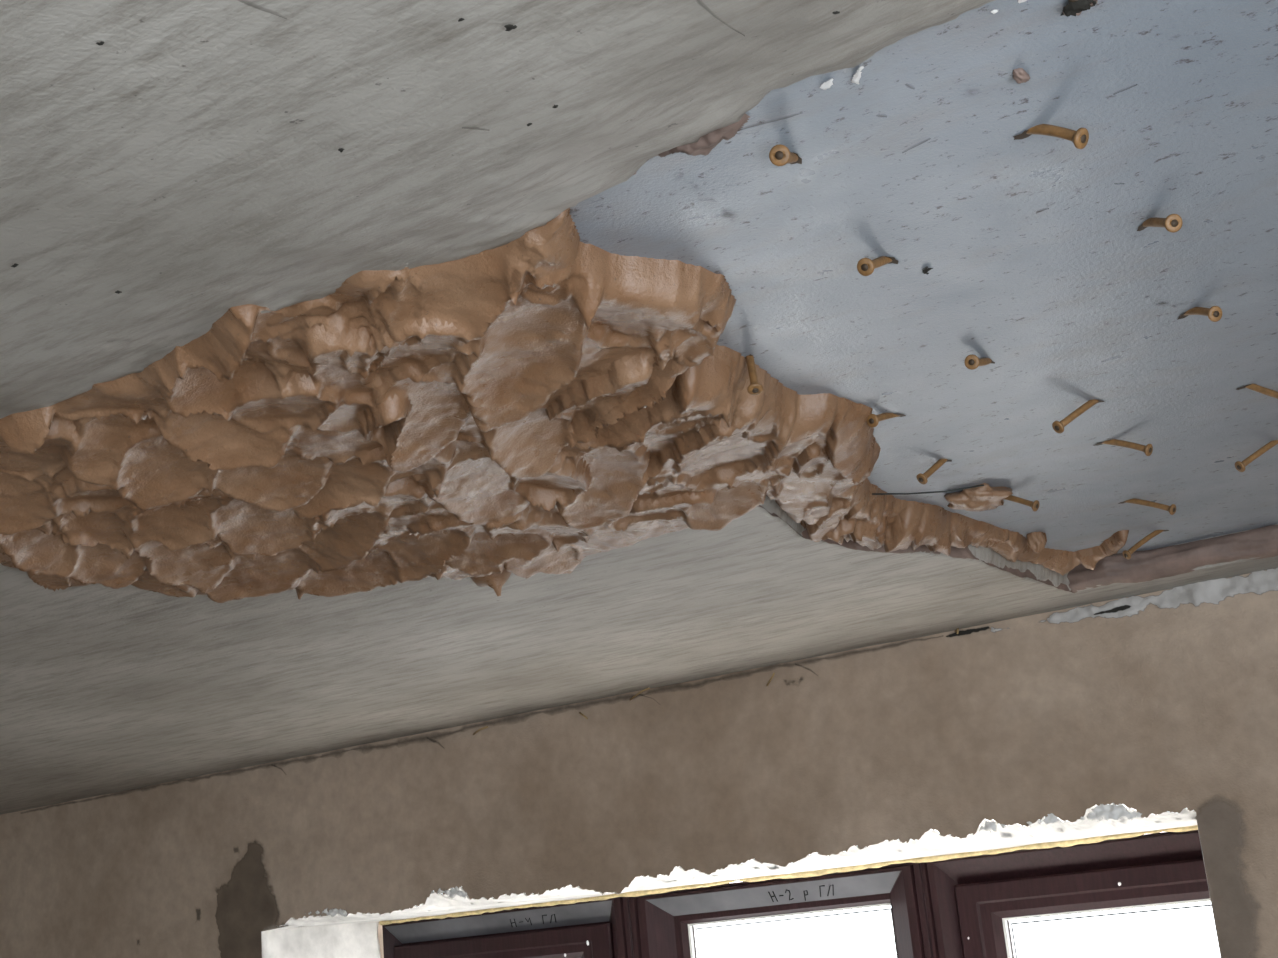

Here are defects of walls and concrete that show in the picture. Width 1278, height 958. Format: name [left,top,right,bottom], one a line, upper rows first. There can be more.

spalling [1061,0,1098,17]
spalling [851,66,864,84]
flaking render [657,114,799,157]
spalling [1040,568,1278,624]